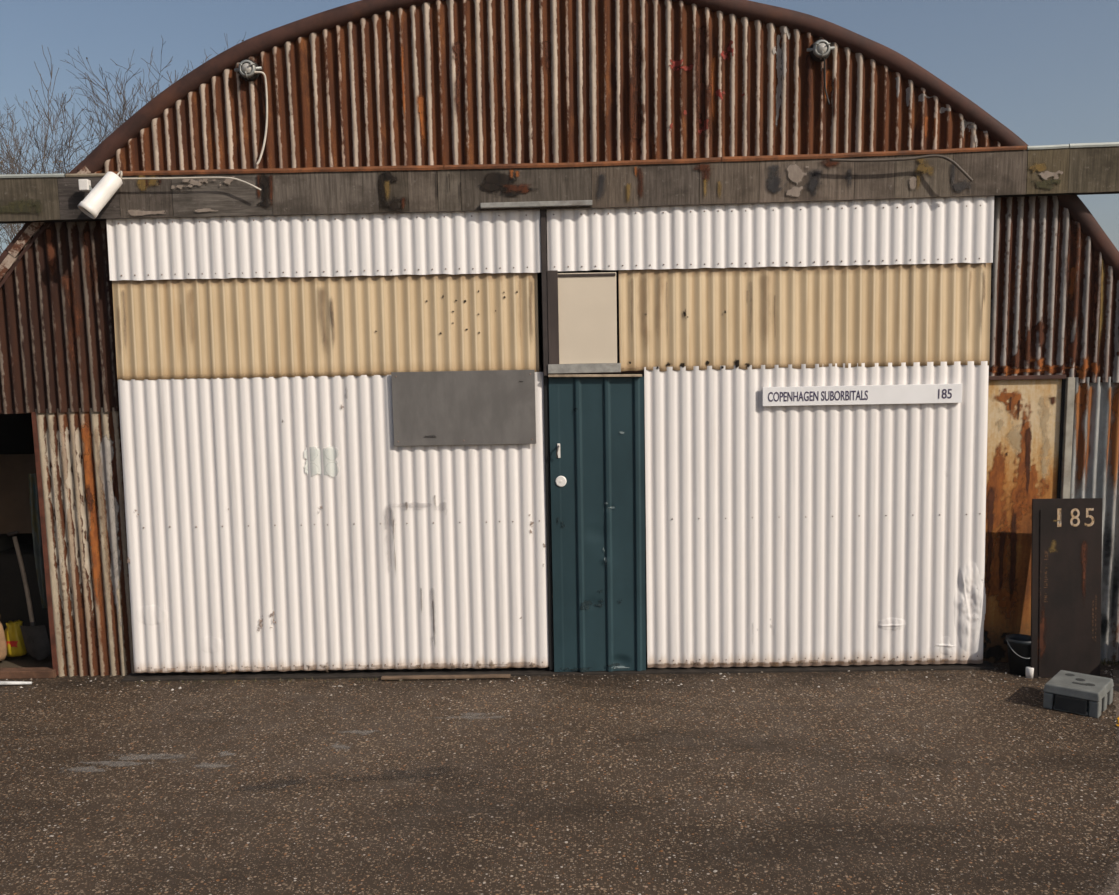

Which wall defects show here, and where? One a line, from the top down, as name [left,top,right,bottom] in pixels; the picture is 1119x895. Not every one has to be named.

corrosion [237,57,266,125]
corrosion [401,45,426,143]
corrosion [452,42,462,113]
corrosion [628,21,645,144]
corrosion [694,26,717,133]
corrosion [806,37,837,120]
corrosion [984,218,1104,619]
corrosion [1107,383,1119,484]
peeling [44,427,95,627]
corrosion [80,424,102,608]
peeling [98,436,130,625]